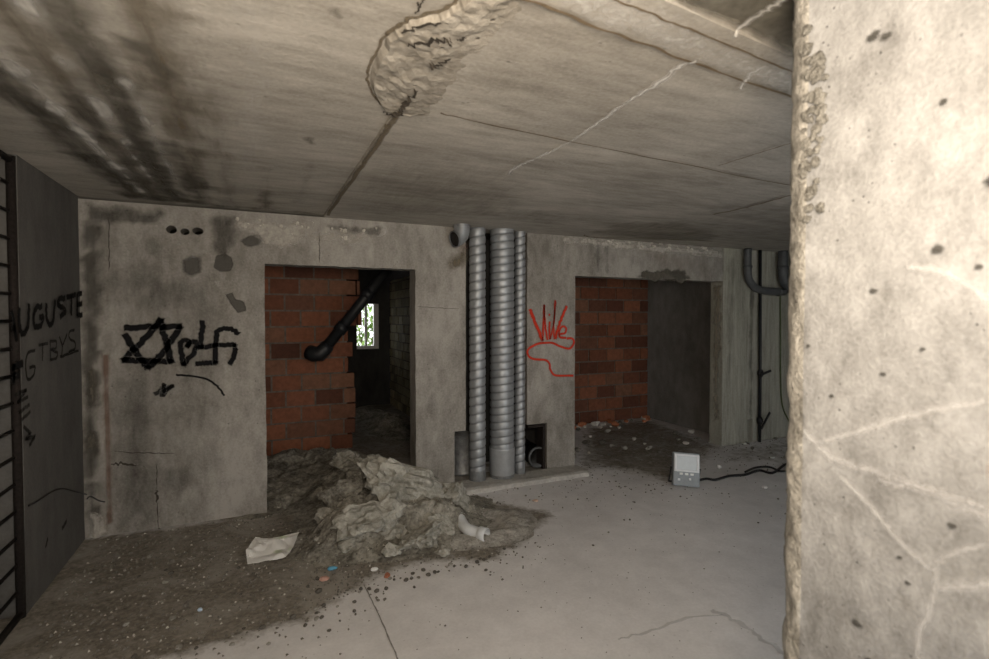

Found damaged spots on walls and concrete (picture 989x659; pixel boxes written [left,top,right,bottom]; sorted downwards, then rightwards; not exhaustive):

water stain [0,0,205,222]
spalling [365,0,523,118]
crack [440,113,791,215]
crack [523,0,792,98]
spalling [797,24,830,223]